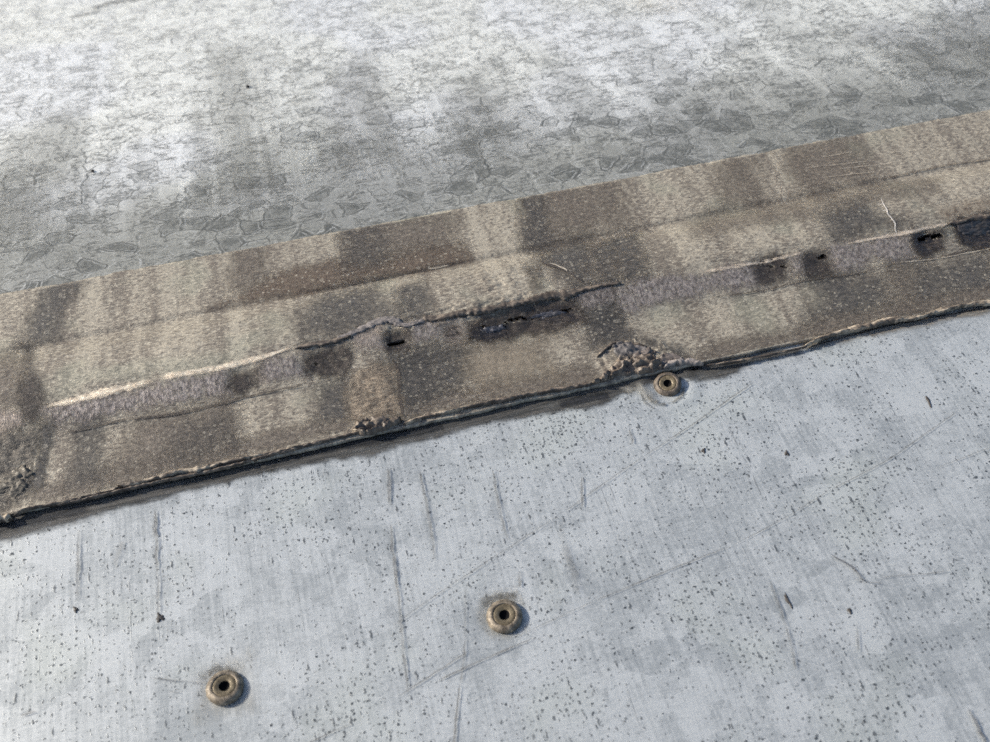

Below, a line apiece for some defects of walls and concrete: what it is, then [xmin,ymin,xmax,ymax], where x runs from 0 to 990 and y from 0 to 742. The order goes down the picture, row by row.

peeling [947,213,990,236]
peeling [295,282,621,349]
peeling [0,299,990,523]